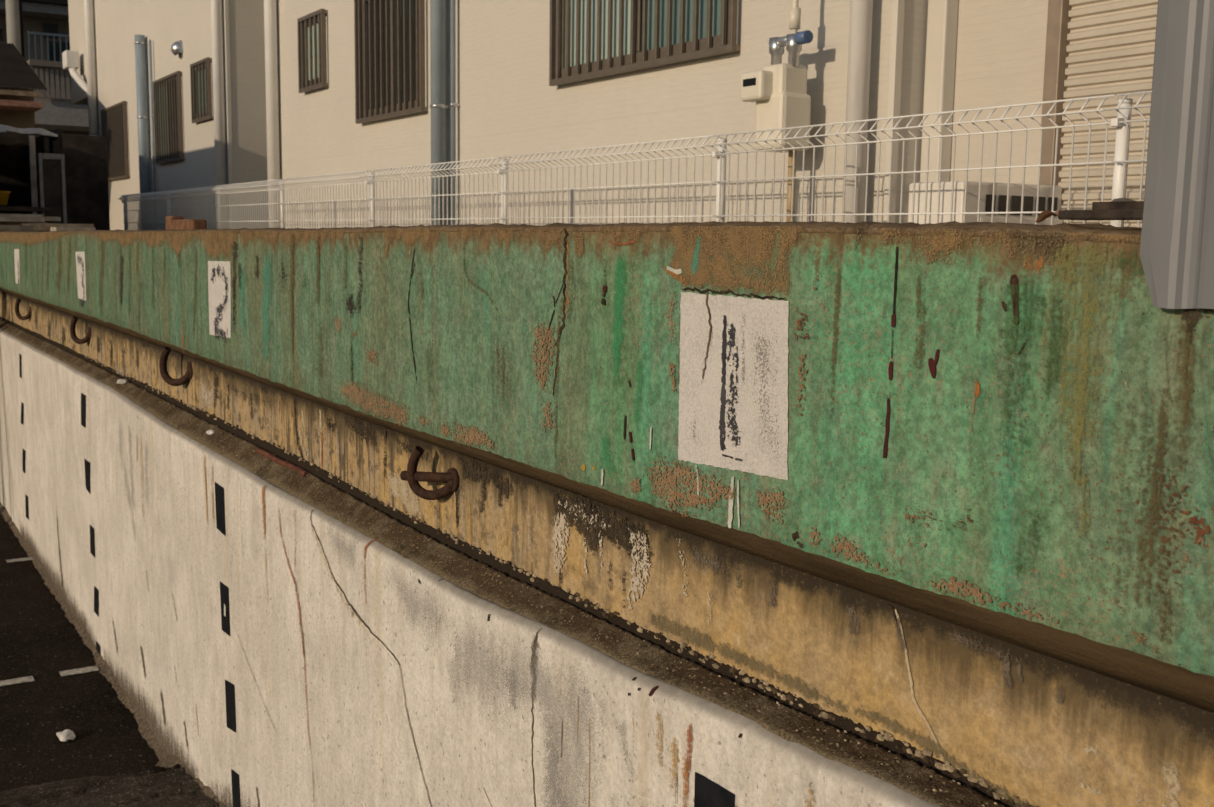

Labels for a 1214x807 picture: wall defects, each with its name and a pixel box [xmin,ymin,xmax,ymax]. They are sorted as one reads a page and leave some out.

crack [546,228,575,457]
peeling [664,226,803,296]
water stain [552,491,653,610]
peeling [629,455,787,524]
peeling [792,527,893,575]
rust [262,487,314,796]
crack [310,509,432,807]
water stain [452,638,595,807]
crack [529,628,542,807]
rust [656,714,692,807]
water stain [650,594,1035,807]
crack [887,604,953,767]